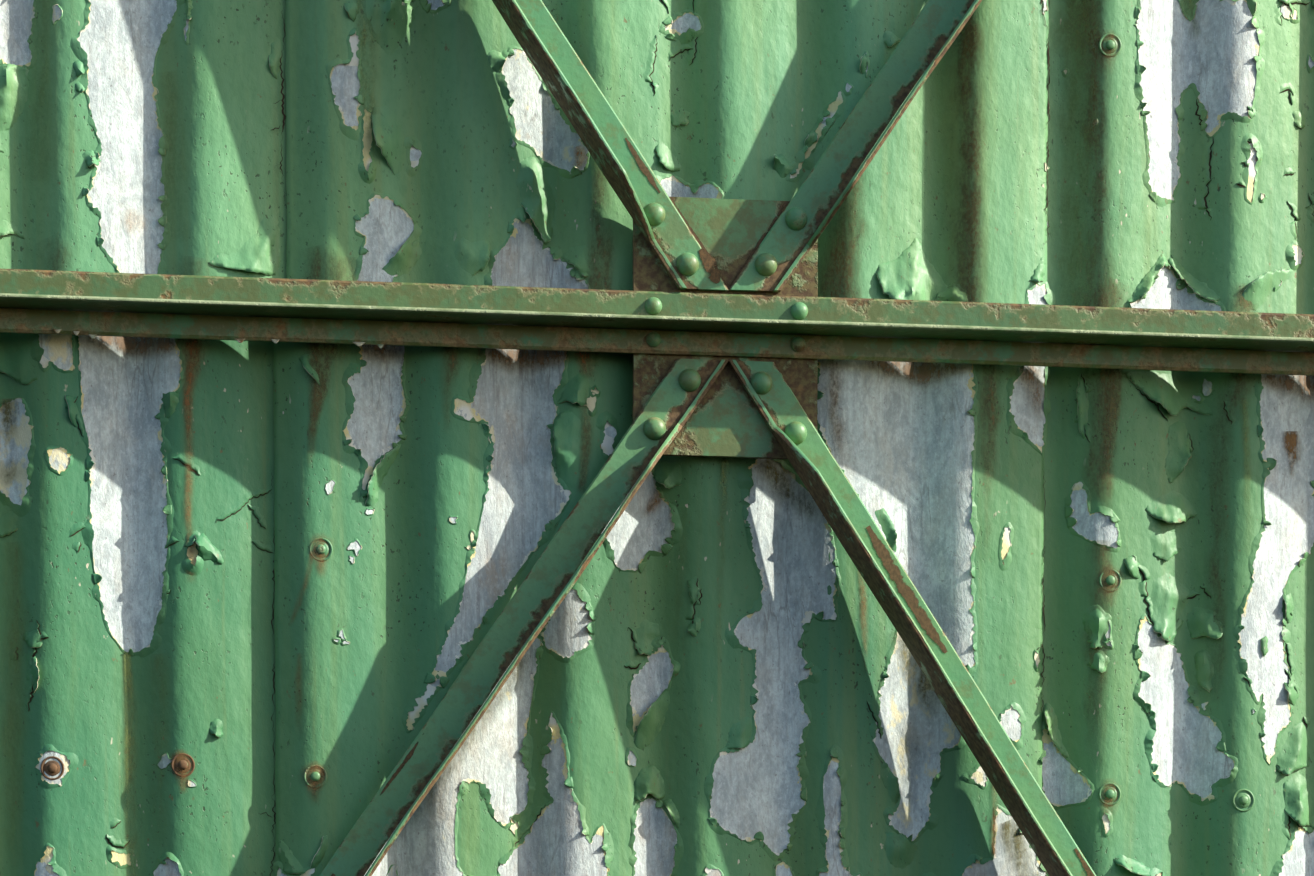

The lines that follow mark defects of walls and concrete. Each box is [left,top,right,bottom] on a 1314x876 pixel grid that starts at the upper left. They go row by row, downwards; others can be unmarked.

peeling [70,0,193,274]
crack [643,0,701,96]
rust [699,248,721,284]
rust [1081,0,1113,263]
peeling [1134,0,1267,207]
peeling [0,329,224,658]
peeling [364,583,684,876]
peeling [704,458,863,876]
peeling [817,359,981,675]
rust [866,525,948,653]
peeling [1064,371,1314,876]
rust [1285,431,1298,467]